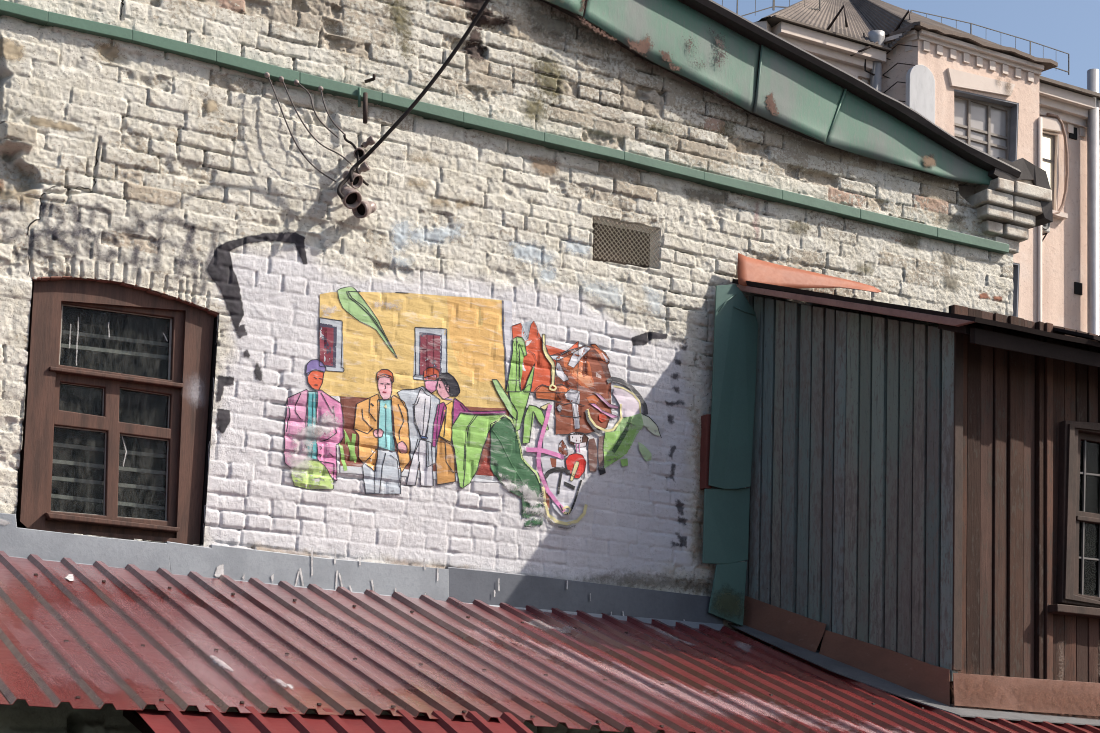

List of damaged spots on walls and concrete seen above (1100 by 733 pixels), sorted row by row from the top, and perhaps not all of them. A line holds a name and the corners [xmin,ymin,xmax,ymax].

damp [464,0,514,61]
rust [578,0,728,72]
crack [27,139,100,277]